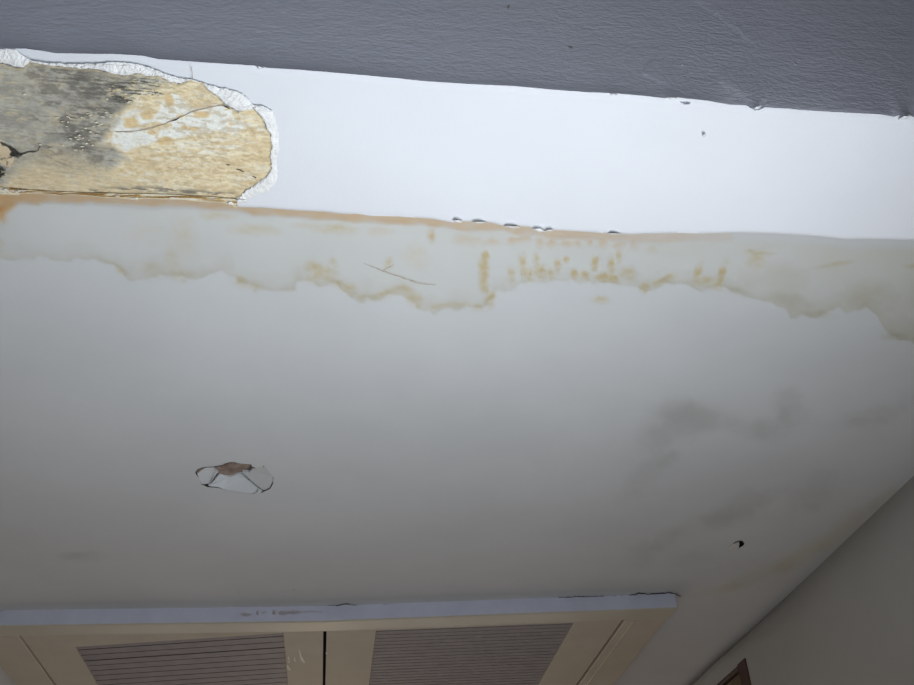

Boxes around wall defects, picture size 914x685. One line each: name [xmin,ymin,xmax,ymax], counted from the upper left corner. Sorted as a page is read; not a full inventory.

spalling [0,49,280,208]